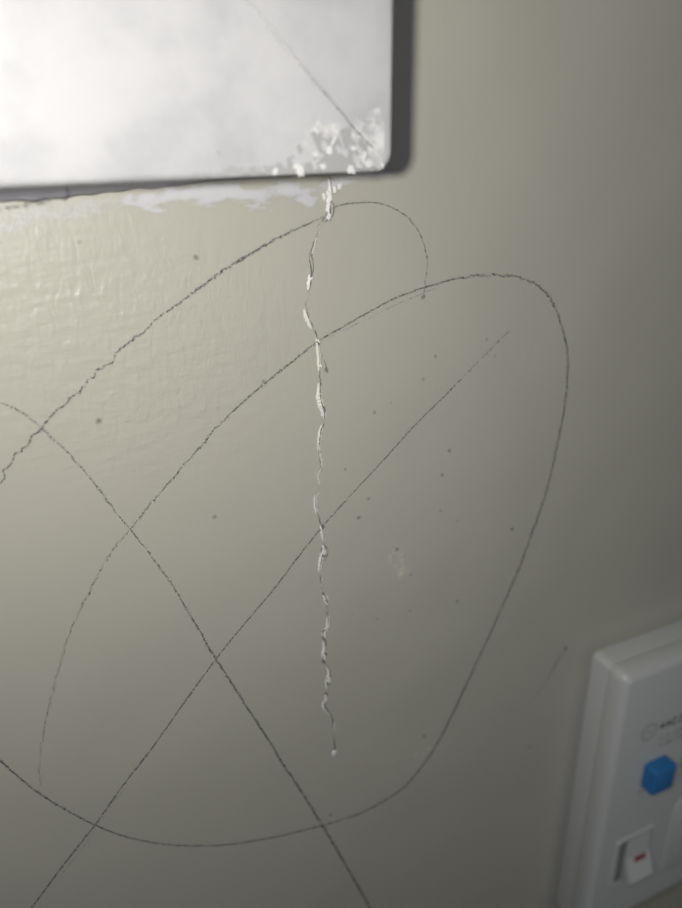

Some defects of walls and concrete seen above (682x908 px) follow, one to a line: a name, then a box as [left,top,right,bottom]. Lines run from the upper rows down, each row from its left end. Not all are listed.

crack [303,174,342,756]